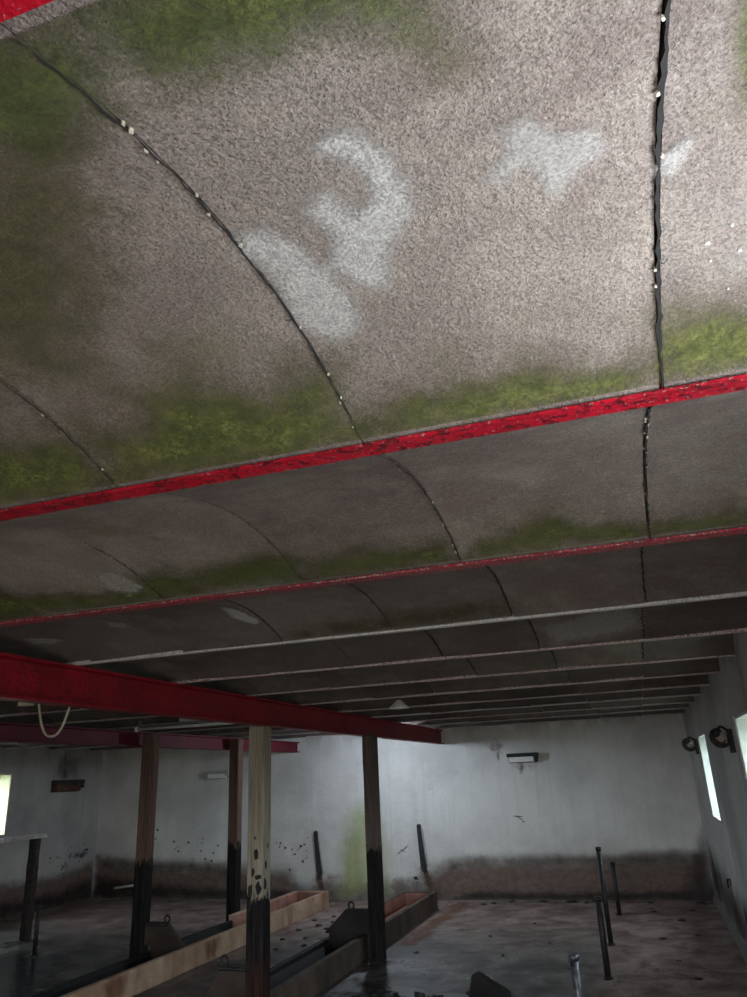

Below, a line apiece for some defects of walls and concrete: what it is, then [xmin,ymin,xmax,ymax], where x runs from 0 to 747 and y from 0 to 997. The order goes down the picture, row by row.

crack [0,39,460,560]
leakage [235,133,409,340]
crack [640,0,671,661]
leakage [221,607,260,625]
crack [486,566,558,669]
leakage [393,857,747,932]